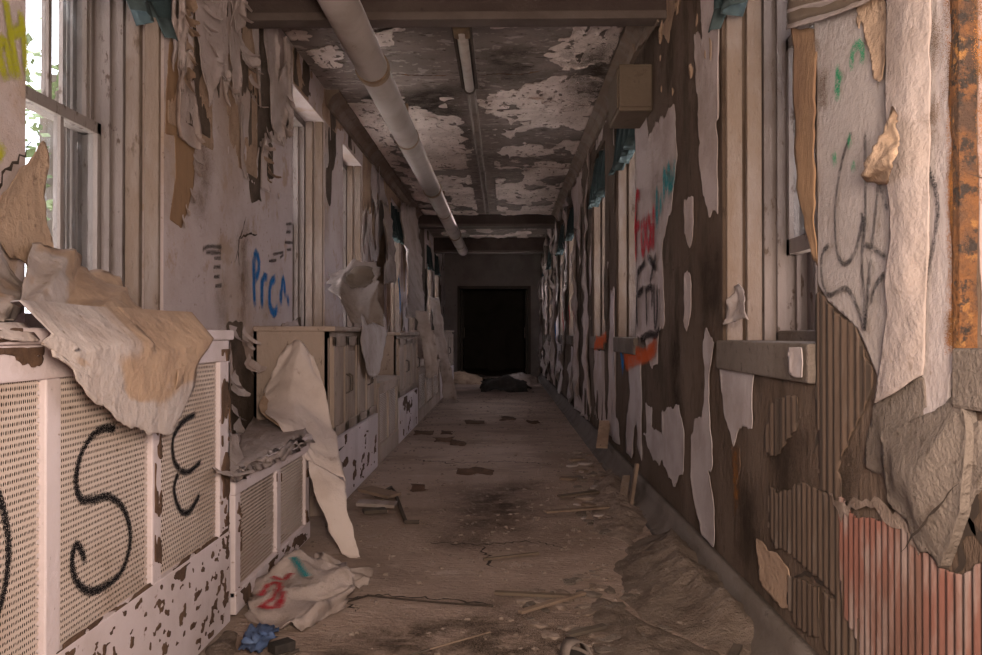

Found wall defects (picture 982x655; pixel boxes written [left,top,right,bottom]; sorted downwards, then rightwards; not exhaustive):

spalling [0,347,45,367]
peeling [165,0,344,228]
flaking render [322,89,437,332]
peeling [374,28,406,47]
flaking render [419,229,448,330]
peeling [402,97,478,215]
flaking render [459,0,754,547]
peeling [755,0,982,655]
rust [970,0,982,203]
flaking render [122,320,267,655]
crack [901,483,982,573]
spalling [93,626,117,655]